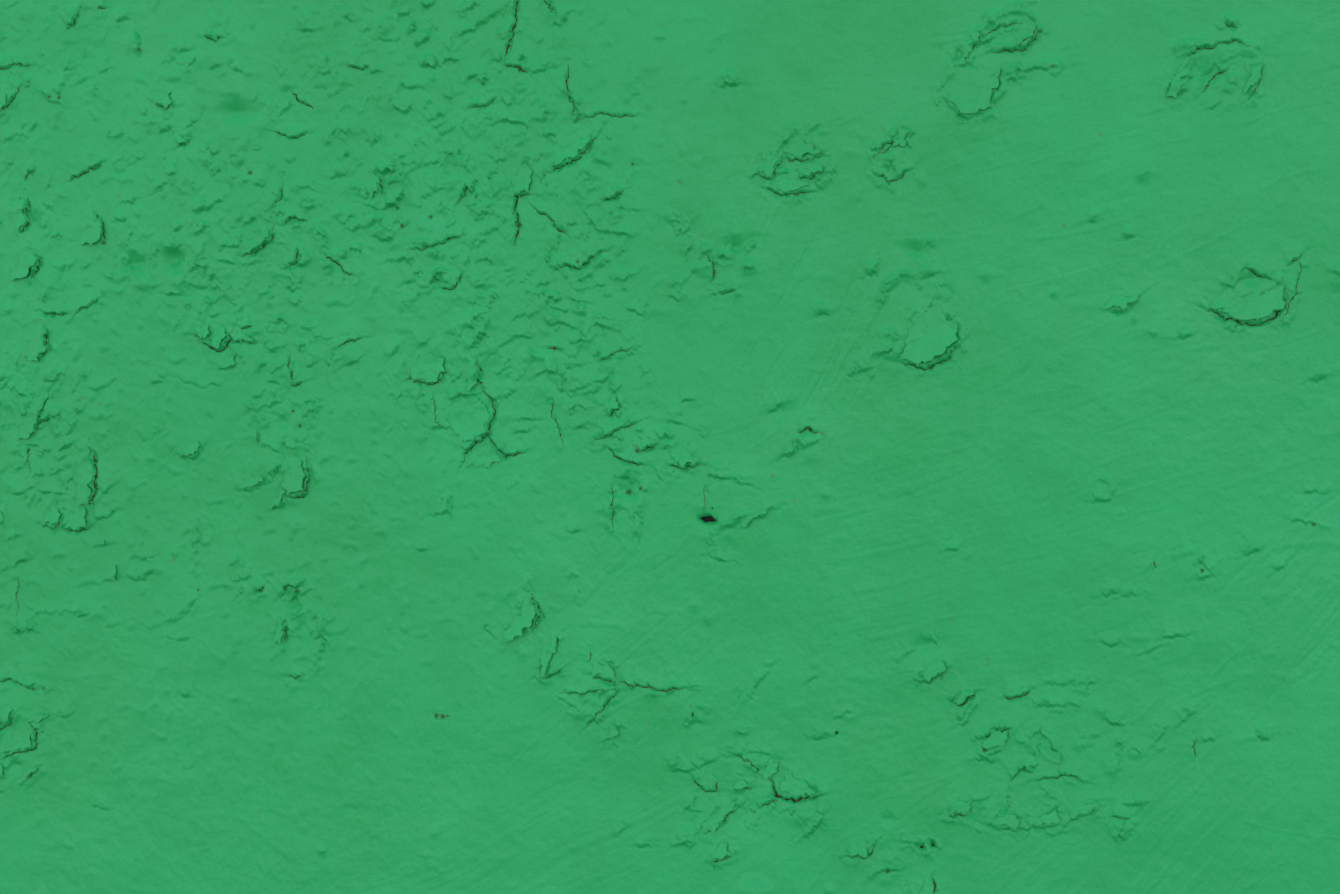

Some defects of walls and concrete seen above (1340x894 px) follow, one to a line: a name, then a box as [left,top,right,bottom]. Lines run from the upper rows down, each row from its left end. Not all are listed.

peeling [930,0,1066,131]
peeling [1154,13,1274,121]
peeling [745,115,839,207]
peeling [861,114,920,193]
peeling [0,143,125,548]
peeling [273,0,577,496]
peeling [846,235,972,384]
peeling [1193,239,1317,335]
peeling [0,669,56,802]
peeling [477,579,836,871]
peeling [803,701,868,747]